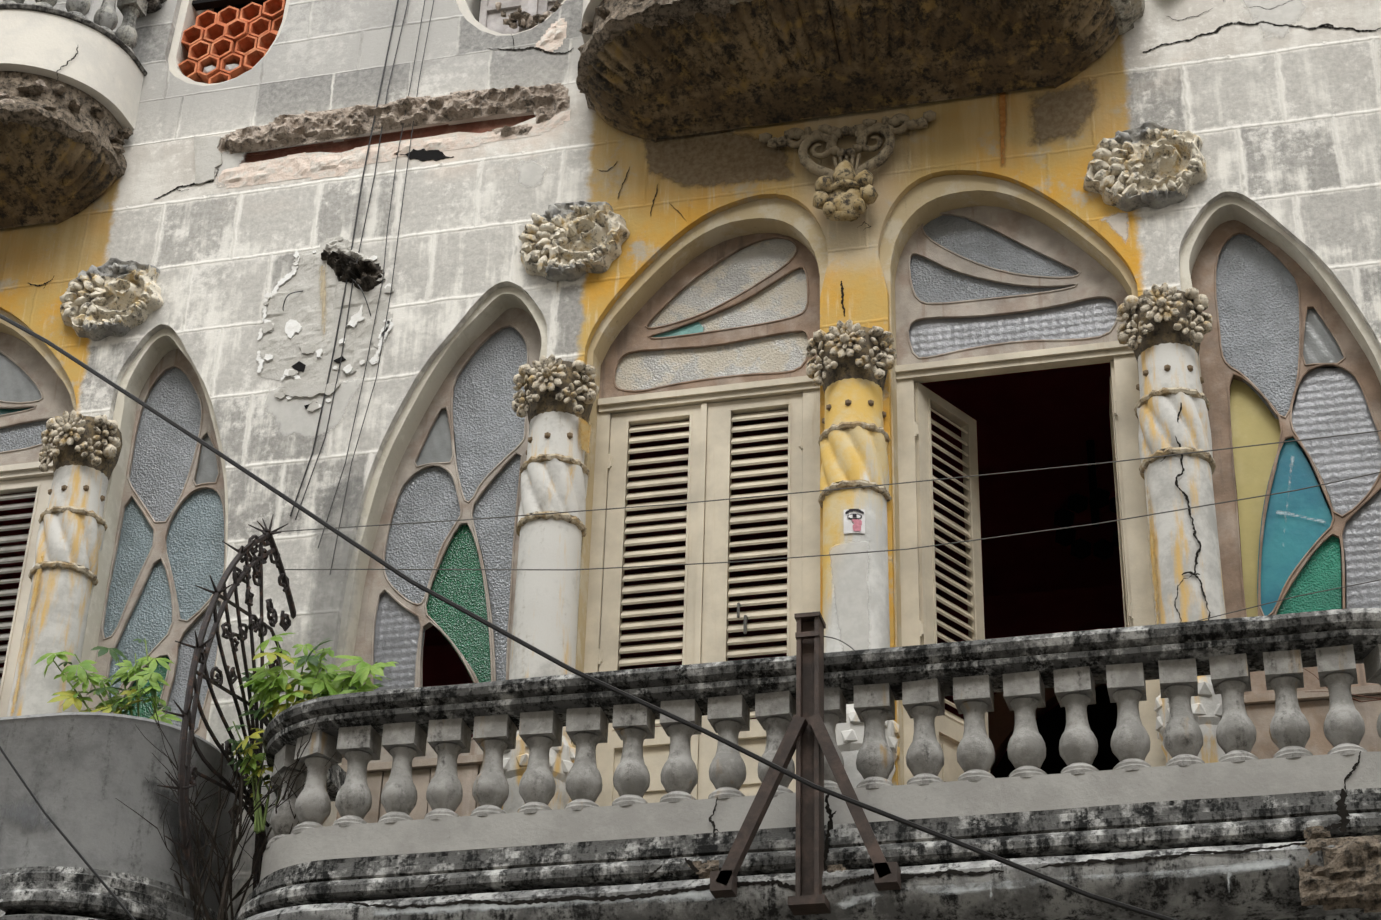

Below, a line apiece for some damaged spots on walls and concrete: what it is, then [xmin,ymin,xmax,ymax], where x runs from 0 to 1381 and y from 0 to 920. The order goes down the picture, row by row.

crack [1143,0,1380,53]
spalling [0,79,133,180]
crack [155,168,219,199]
spalling [194,0,731,189]
damp [643,131,793,187]
flaking render [256,236,394,413]
crack [1160,403,1211,620]
damp [372,890,723,916]
crack [333,794,1004,909]
efflorescence [839,892,880,908]
crack [1037,751,1361,869]
efflorescence [1155,858,1289,884]